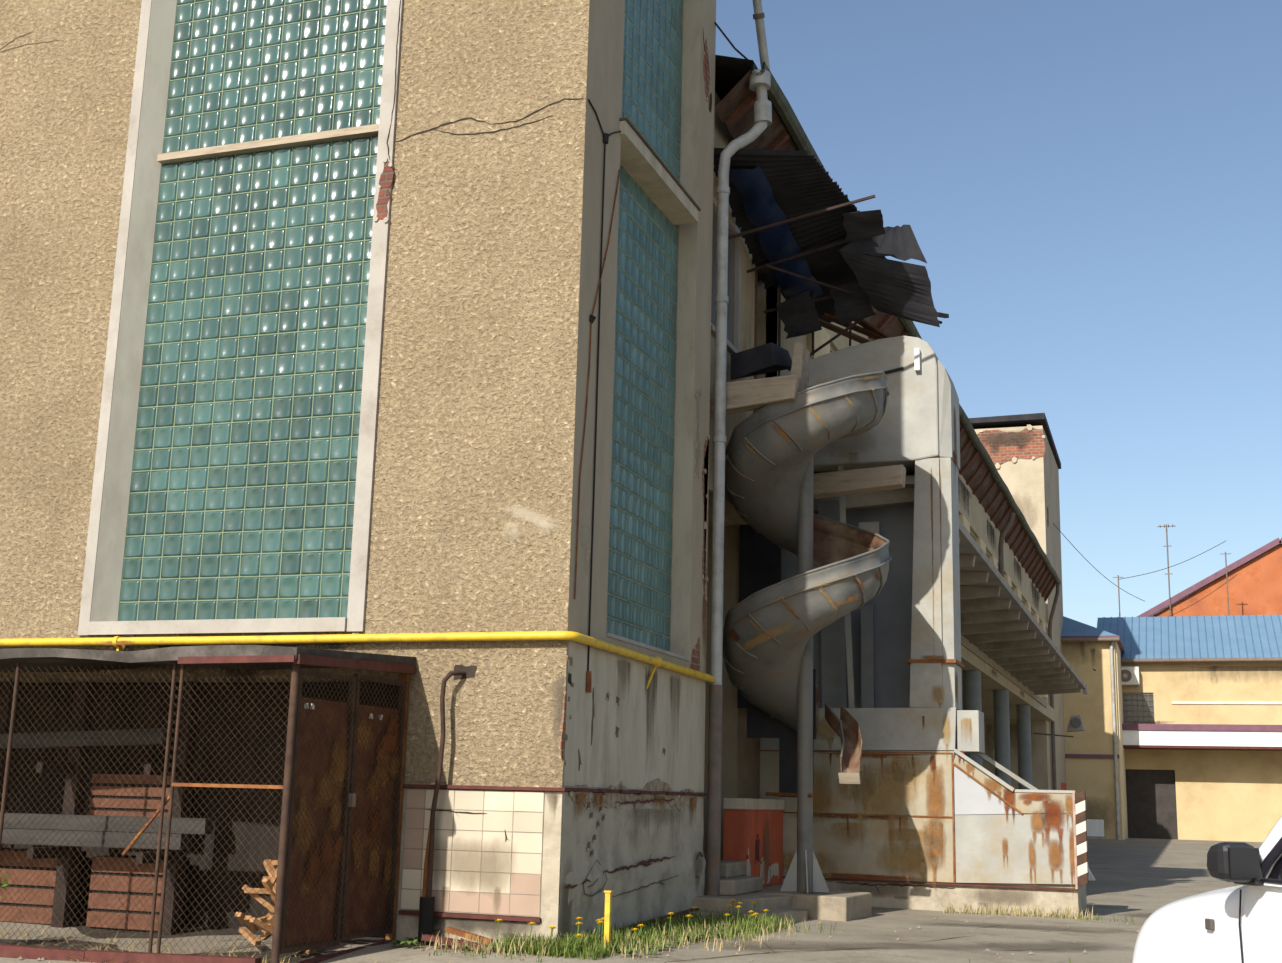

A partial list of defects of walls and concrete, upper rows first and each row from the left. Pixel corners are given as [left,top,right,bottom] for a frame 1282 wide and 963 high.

crack [0,32,59,52]
crack [386,0,584,160]
spalling [703,38,712,112]
spalling [373,157,394,223]
rust [931,411,957,573]
spalling [977,425,1045,469]
spalling [560,655,696,857]
rust [934,676,1076,890]